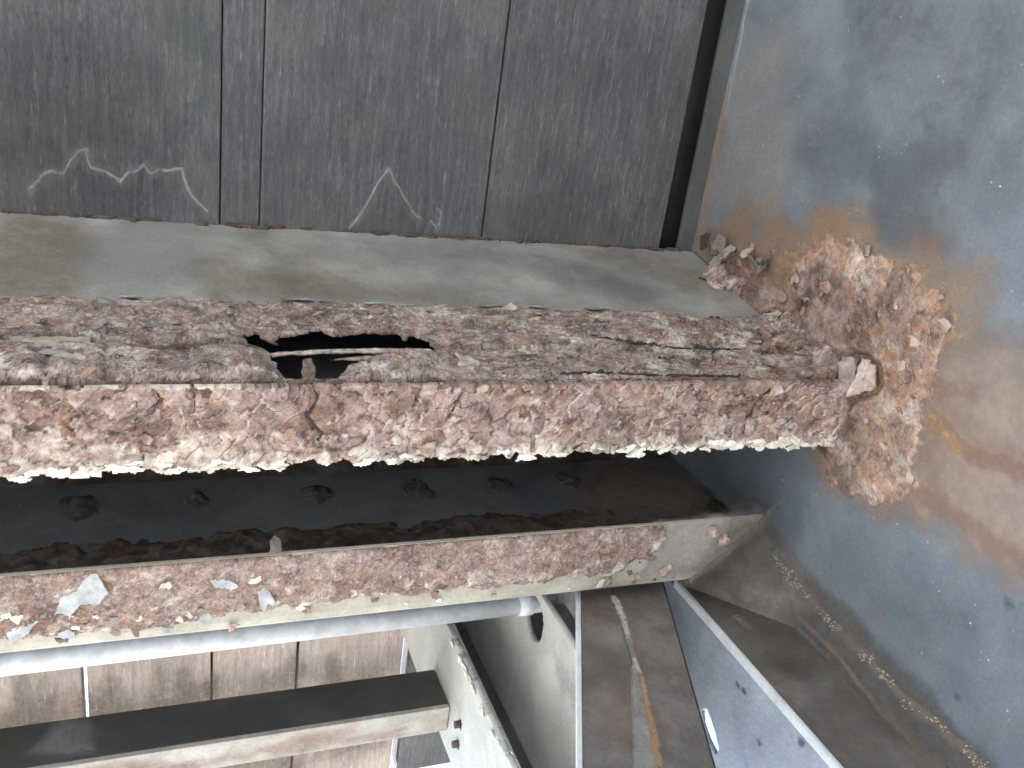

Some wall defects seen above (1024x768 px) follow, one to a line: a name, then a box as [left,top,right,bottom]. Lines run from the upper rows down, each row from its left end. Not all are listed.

peeling [301,358,316,378]
corrosion [0,203,1024,645]
peeling [54,573,109,617]
peeling [211,579,238,590]
peeling [257,589,277,614]
peeling [6,620,38,645]
corrosion [633,658,663,767]